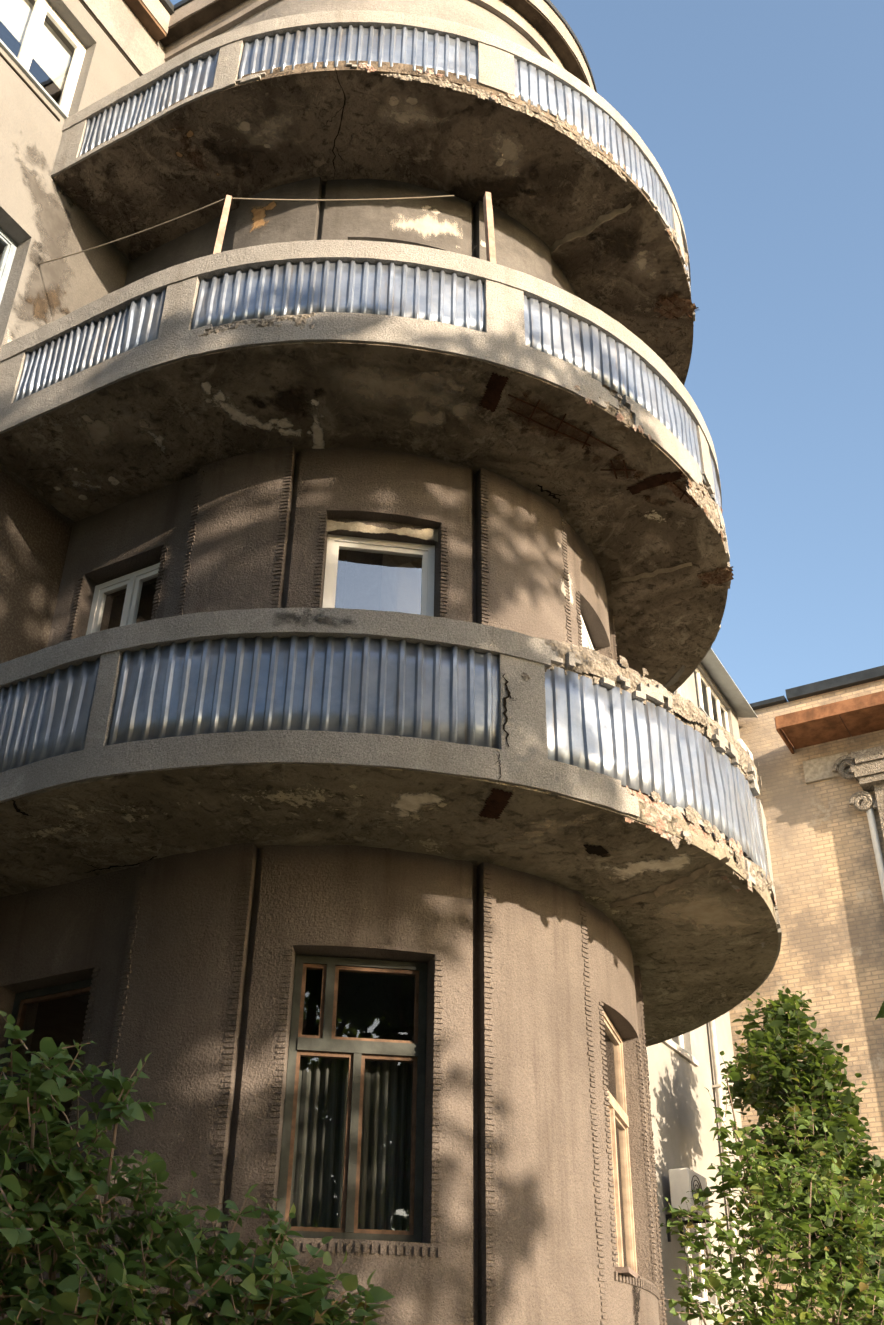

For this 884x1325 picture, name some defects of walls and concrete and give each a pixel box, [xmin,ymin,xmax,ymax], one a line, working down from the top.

crack [318,68,346,180]
spalling [359,62,626,181]
spalling [665,225,688,267]
spalling [653,296,698,319]
corrosion [479,372,509,412]
spalling [521,637,762,789]
peeling [385,790,452,853]
corrosion [478,788,514,819]
spalling [621,785,777,905]